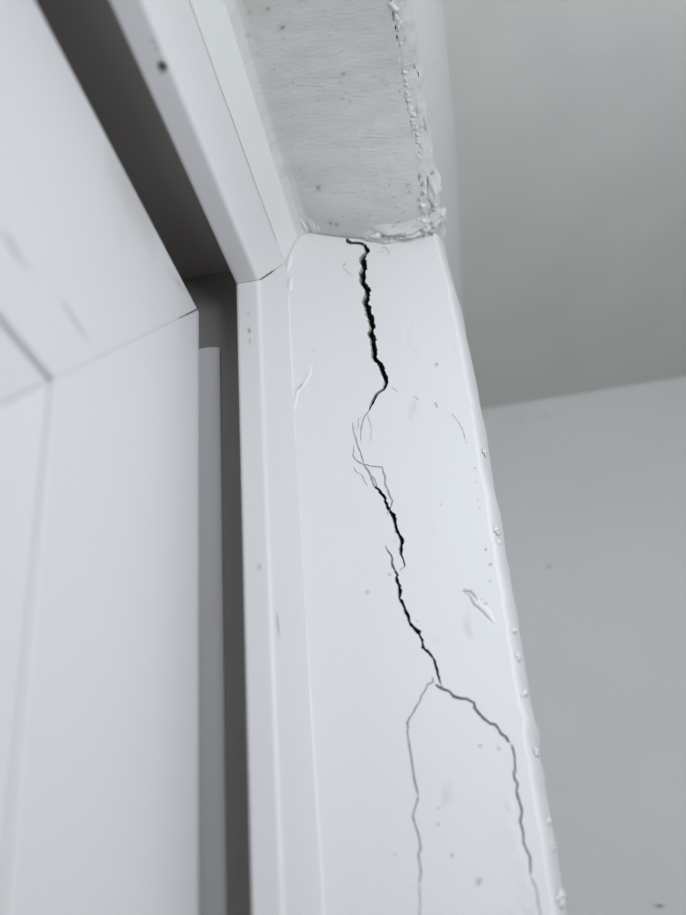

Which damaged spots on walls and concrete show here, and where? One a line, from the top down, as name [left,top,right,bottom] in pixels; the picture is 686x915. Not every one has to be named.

crack [346,238,541,915]